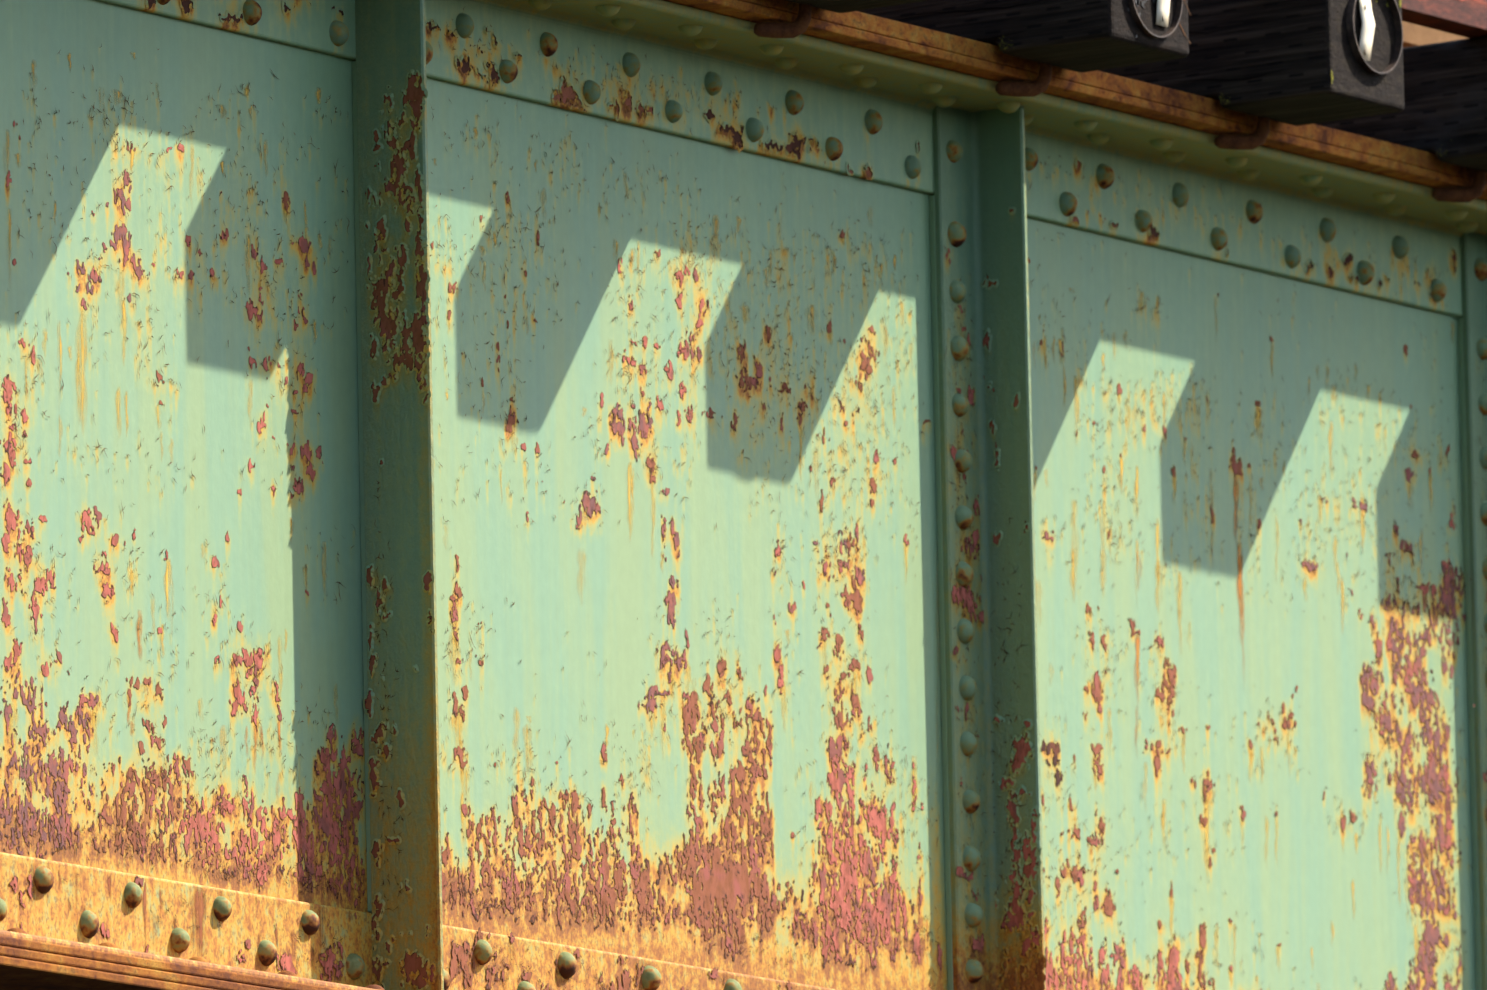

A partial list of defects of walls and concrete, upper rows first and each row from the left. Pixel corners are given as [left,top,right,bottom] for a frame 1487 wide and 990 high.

rust [282,191,306,214]
peeling [364,69,434,406]
rust [45,318,86,411]
peeling [562,476,601,530]
rust [628,449,656,524]
rust [1229,439,1262,625]
peeling [0,374,407,929]
peeling [421,554,484,666]
peeling [441,516,942,990]
peeling [1349,505,1471,990]
rust [195,889,220,952]
rust [996,940,1046,990]